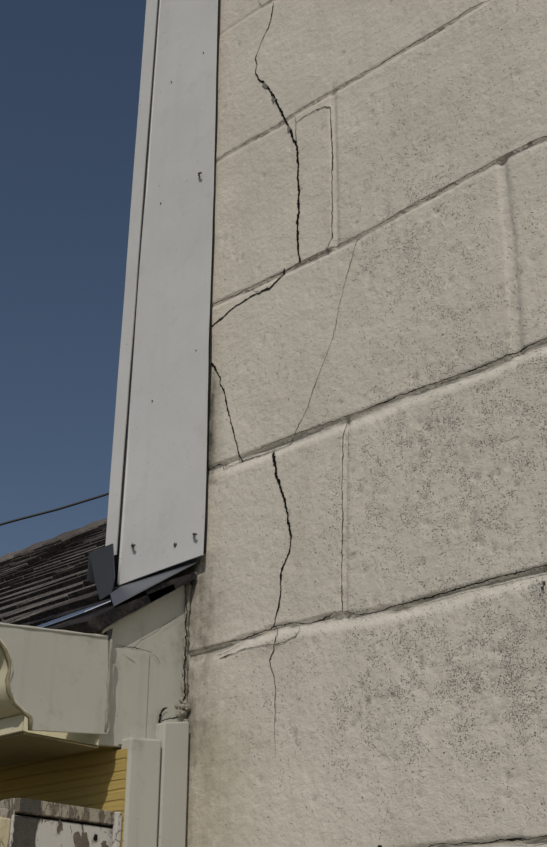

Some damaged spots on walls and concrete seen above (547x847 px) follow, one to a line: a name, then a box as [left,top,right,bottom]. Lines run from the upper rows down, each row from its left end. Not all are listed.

crack [119,599,188,724]
crack [209,0,547,758]